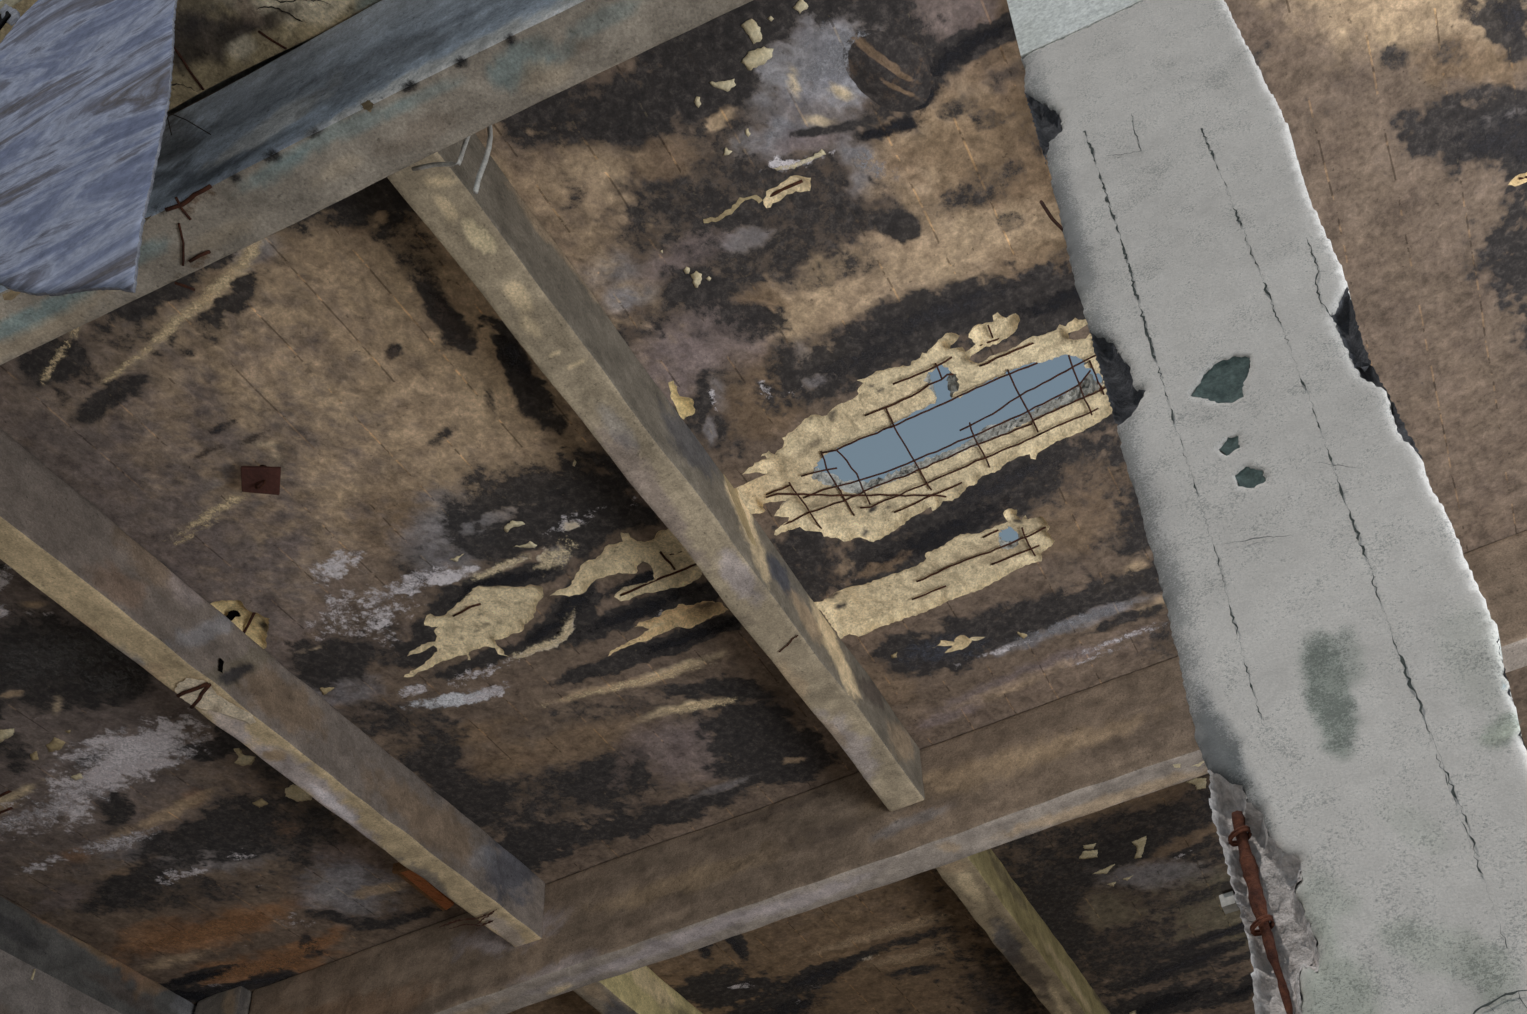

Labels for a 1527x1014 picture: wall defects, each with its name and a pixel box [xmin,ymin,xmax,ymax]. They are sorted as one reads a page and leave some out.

flaking render [694,16,774,108]
damp [856,118,917,177]
spalling [737,312,1146,542]
crack [1083,114,1289,722]
damp [175,495,245,544]
damp [452,543,574,605]
spalling [404,529,729,677]
spalling [814,508,1055,639]
efflorescence [404,684,502,708]
efflorescence [2,727,200,830]
spalling [1173,761,1320,1014]
rust [1228,810,1293,1014]